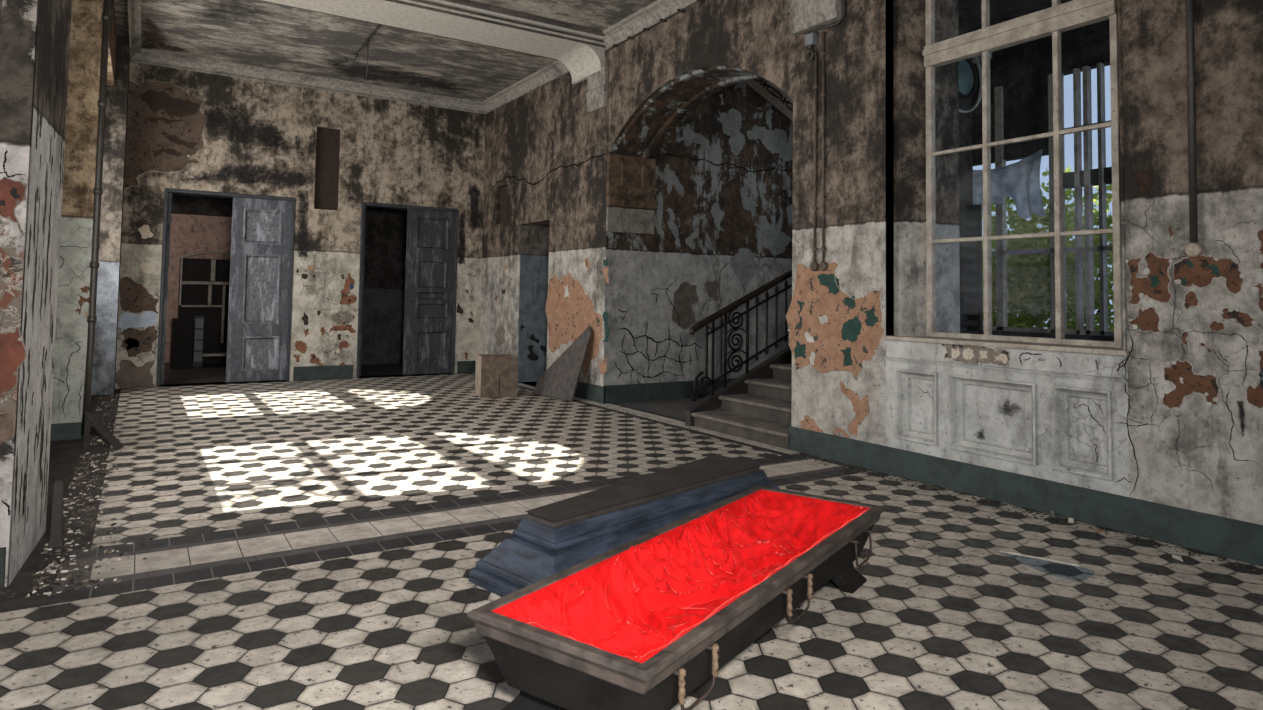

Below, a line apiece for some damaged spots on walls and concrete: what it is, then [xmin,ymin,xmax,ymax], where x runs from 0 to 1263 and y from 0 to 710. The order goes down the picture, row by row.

water stain [324,59,461,90]
crack [0,150,26,178]
crack [492,116,614,237]
peeling [0,0,72,585]
flaking render [115,261,159,389]
peeling [496,257,610,380]
crack [614,263,791,384]
peeling [785,262,885,438]
crack [1019,352,1062,368]
crack [1073,251,1263,493]
peeling [1162,332,1220,409]
peeling [1125,225,1263,333]